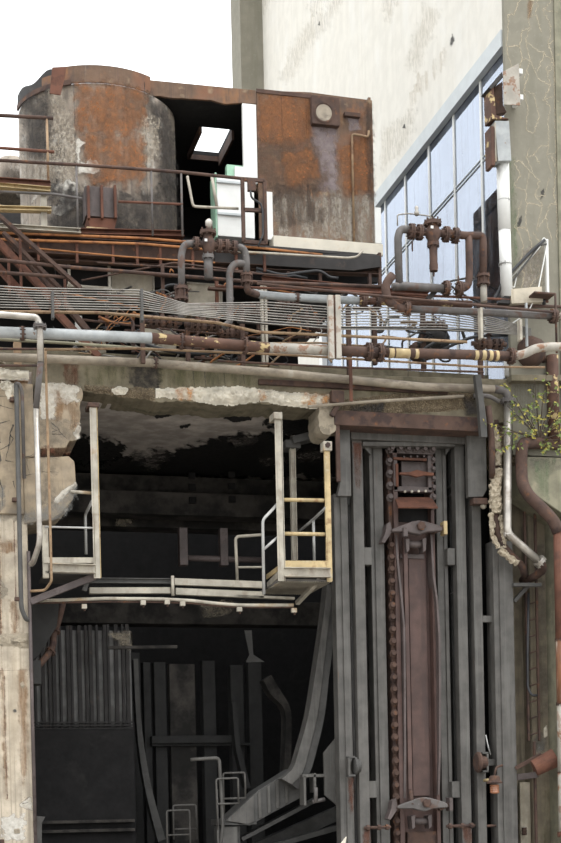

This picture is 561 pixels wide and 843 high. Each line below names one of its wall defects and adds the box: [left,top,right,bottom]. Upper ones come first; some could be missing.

corrosion [274,150,322,224]
corrosion [339,106,373,194]
crack [506,0,558,289]
spalling [40,382,329,420]
crack [0,390,51,507]
spalling [54,482,77,503]